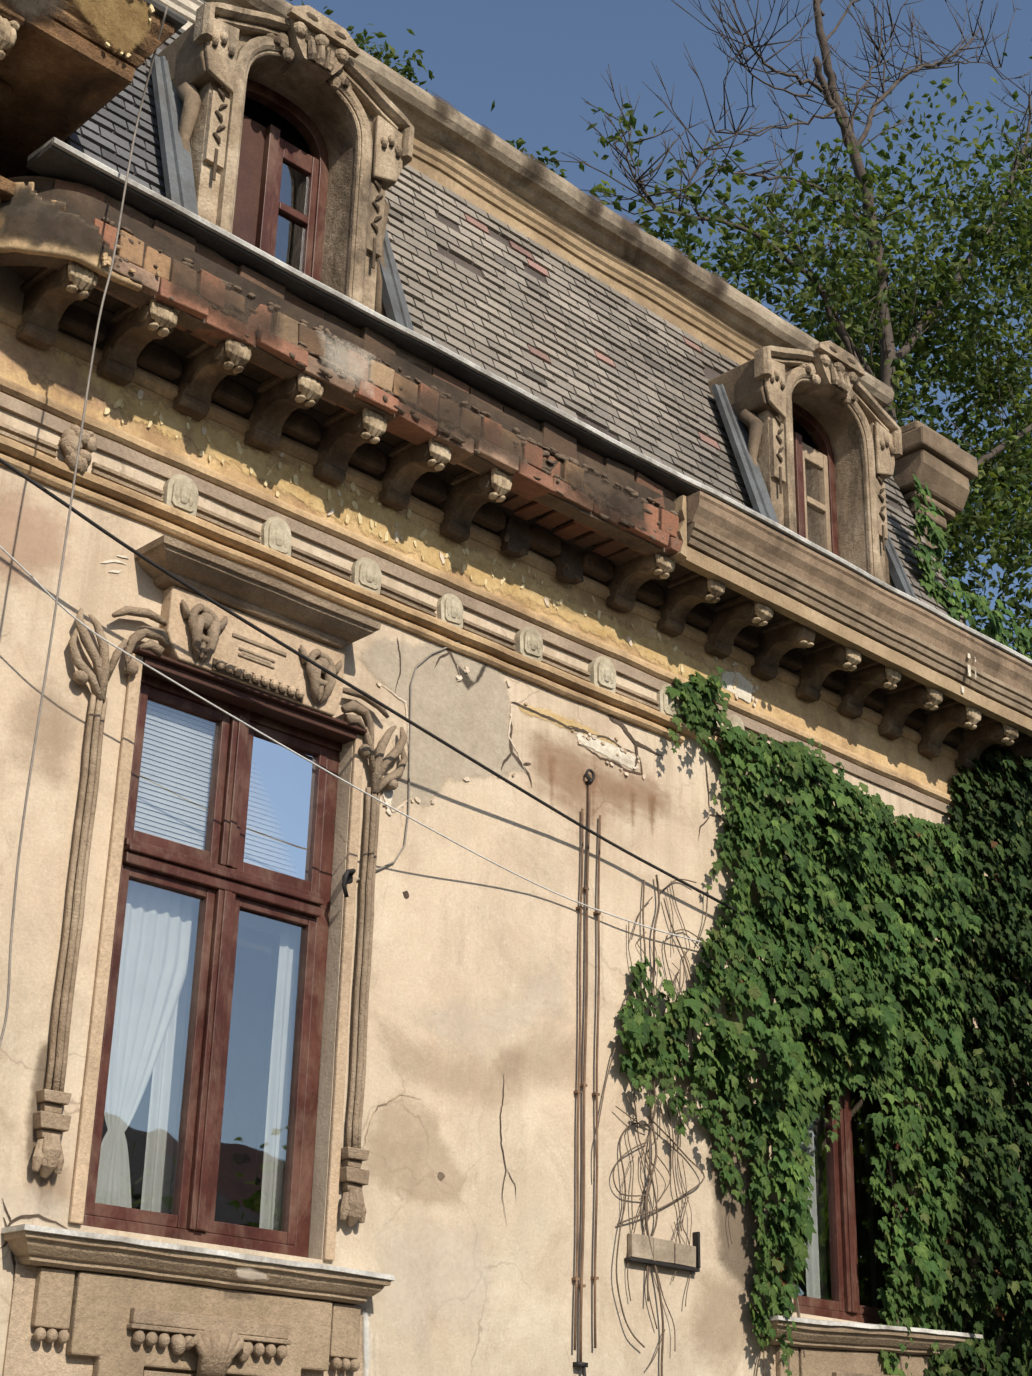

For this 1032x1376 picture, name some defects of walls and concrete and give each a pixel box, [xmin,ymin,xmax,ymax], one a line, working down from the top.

peeling [75,0,155,58]
spalling [0,178,687,563]
peeling [35,349,758,707]
peeling [362,635,646,816]
crack [500,1085,516,1224]